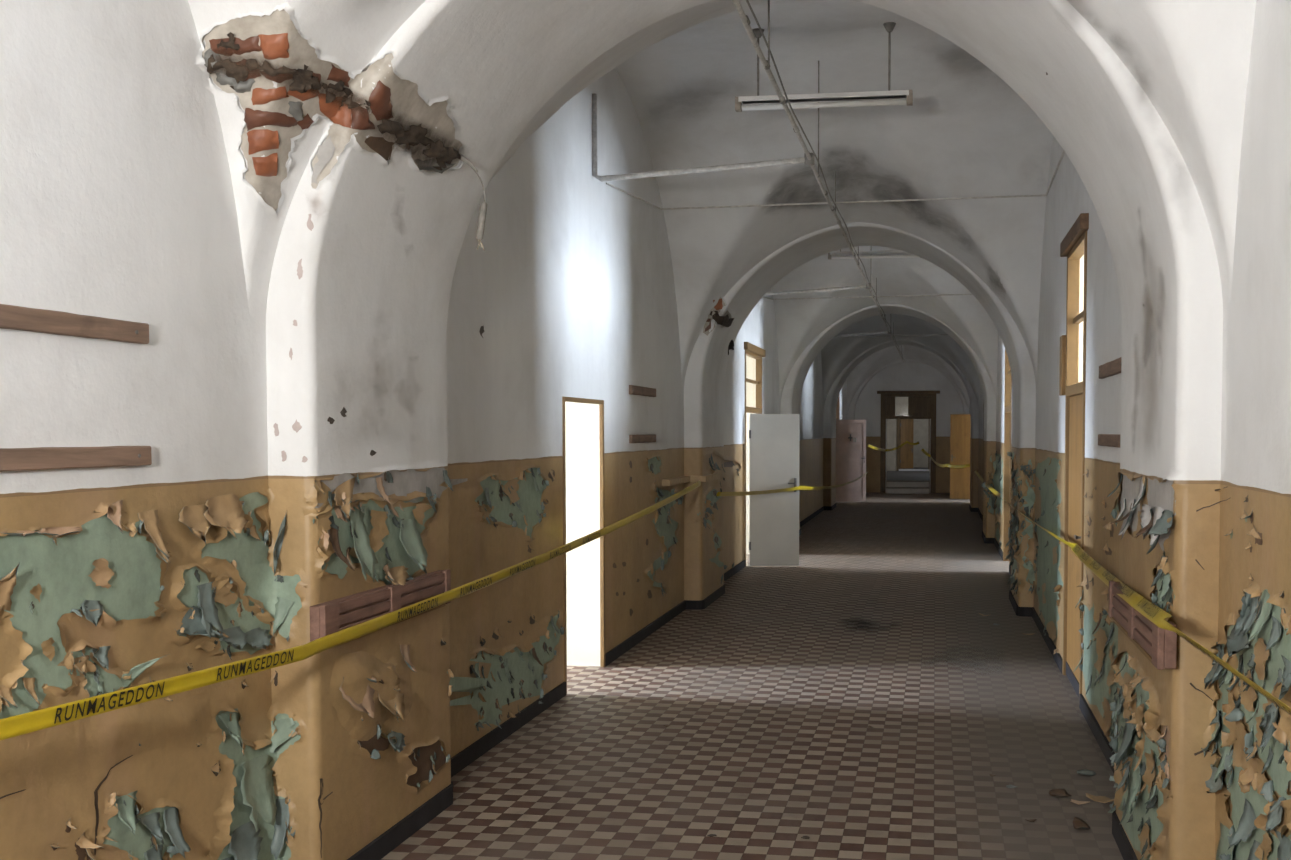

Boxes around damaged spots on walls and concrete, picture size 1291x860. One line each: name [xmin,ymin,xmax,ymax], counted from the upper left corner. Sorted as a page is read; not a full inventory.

flaking render [194,1,468,221]
flaking render [699,293,737,338]
peeling [0,419,557,719]
peeling [1224,495,1262,553]
peeling [51,700,307,860]
peeling [339,645,451,796]
peeling [447,610,564,732]
peeling [981,447,1188,860]
peeling [1201,573,1291,860]